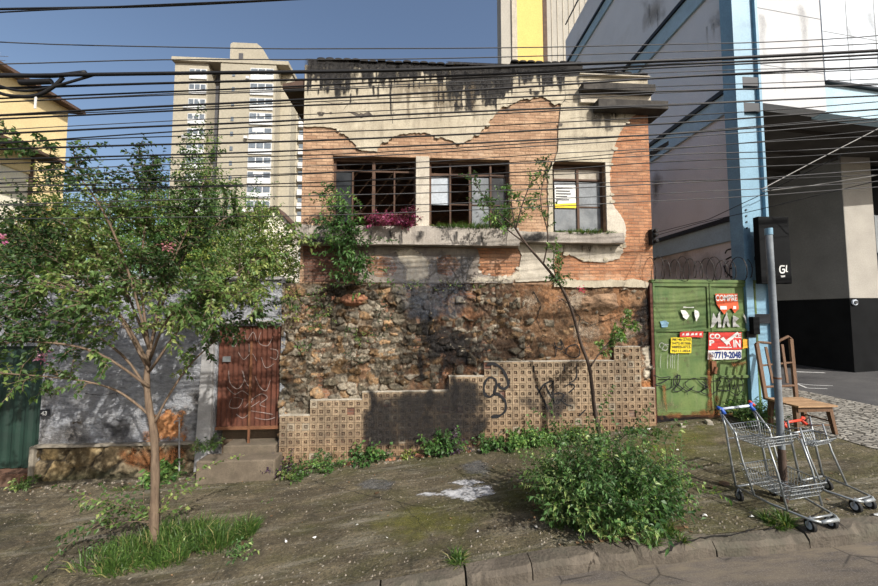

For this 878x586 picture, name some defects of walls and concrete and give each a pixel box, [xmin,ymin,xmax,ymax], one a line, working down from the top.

damp [306,58,566,114]
damp [594,113,618,130]
flaking render [301,94,563,232]
flaking render [303,246,461,282]
flaking render [472,248,521,283]
rust [663,354,732,417]
peeling [144,406,191,442]